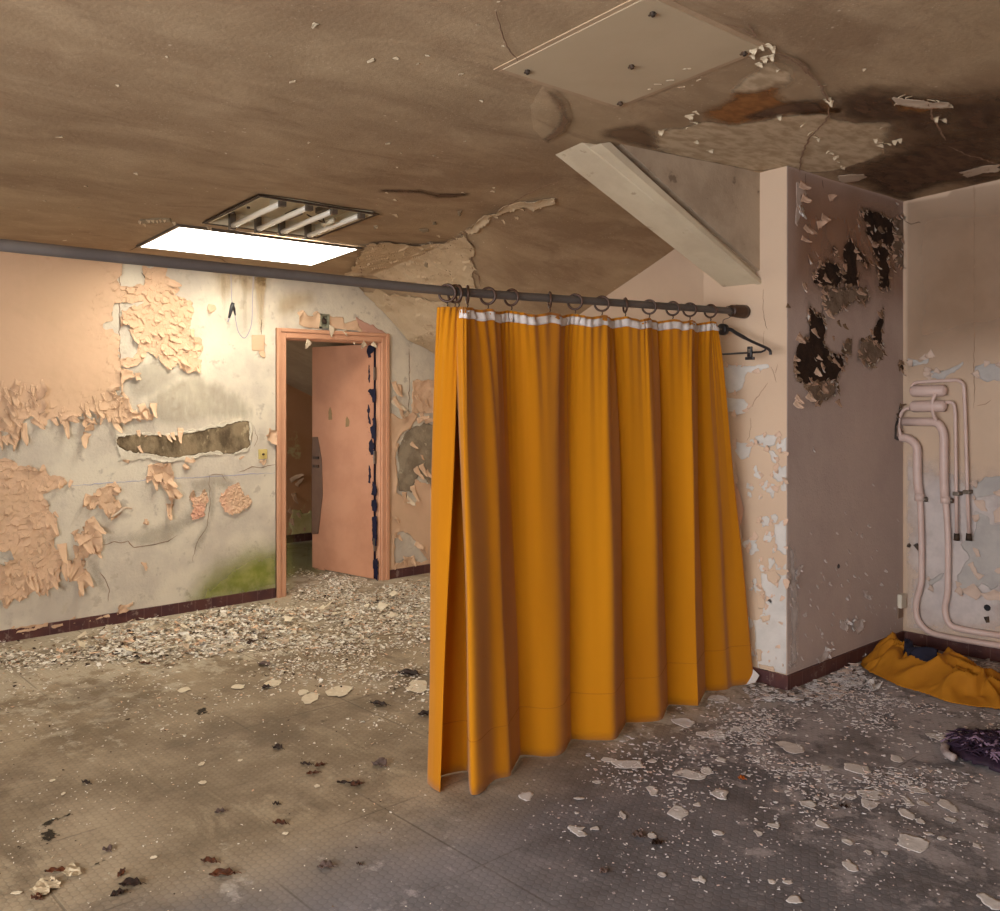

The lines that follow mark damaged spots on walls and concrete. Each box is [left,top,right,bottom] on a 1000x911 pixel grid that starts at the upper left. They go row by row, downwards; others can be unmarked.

peeling [733,43,791,94]
corrosion [705,87,829,124]
crack [724,23,830,183]
damp [845,92,1000,195]
peeling [892,95,954,124]
peeling [959,164,1000,178]
peeling [344,198,556,354]
peeling [656,97,906,409]
peeling [0,252,253,609]
peeling [390,379,434,570]
peeling [732,431,790,685]
peeling [954,476,1000,623]